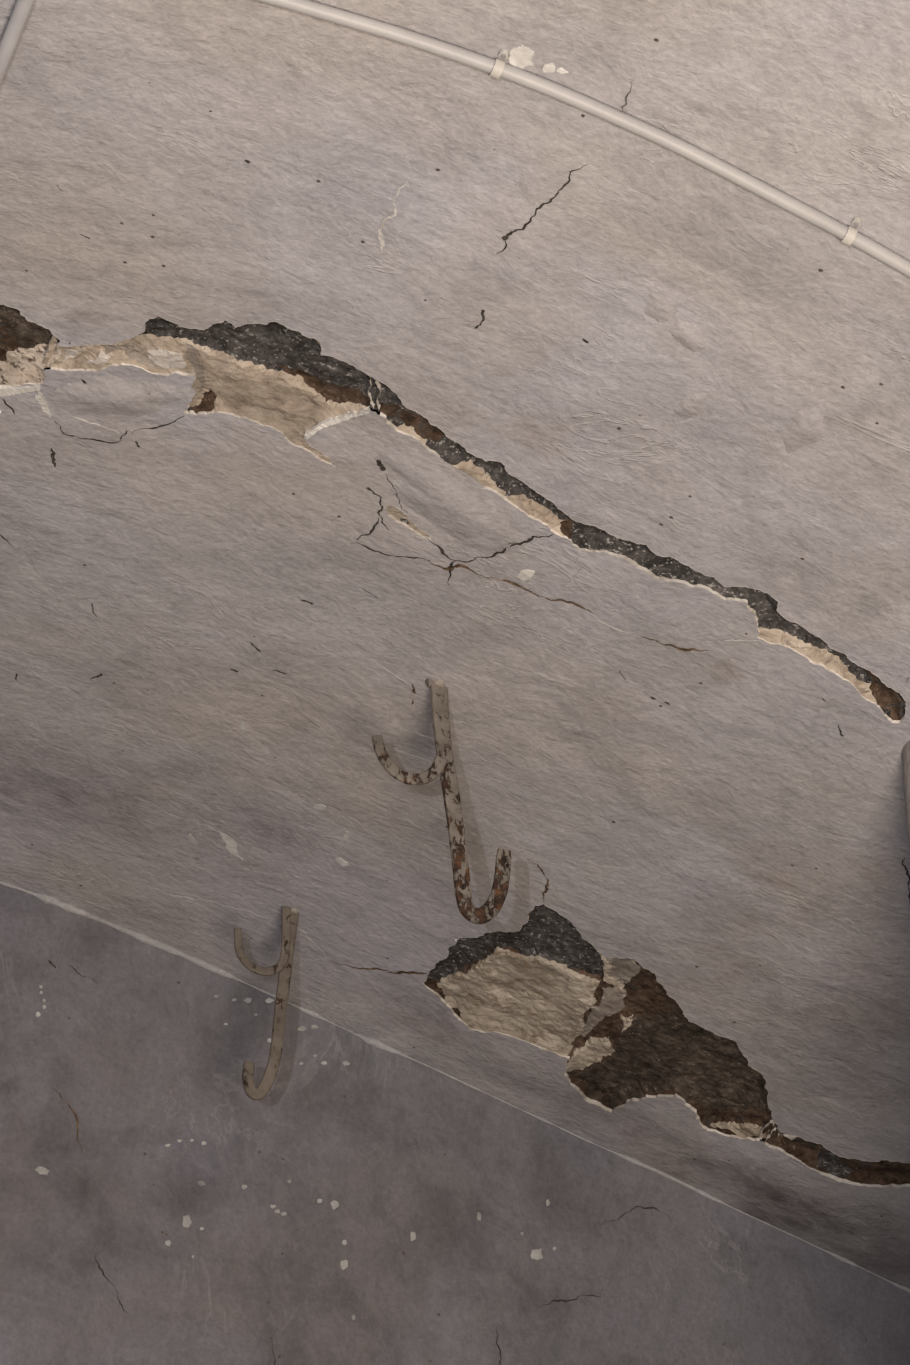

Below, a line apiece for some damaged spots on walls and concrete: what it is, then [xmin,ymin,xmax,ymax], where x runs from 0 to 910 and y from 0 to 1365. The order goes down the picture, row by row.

crack [497,164,588,254]
flaking render [0,304,381,467]
flaking render [385,505,432,540]
peeling [518,570,535,581]
crack [351,377,910,740]
peeling [219,831,243,860]
flaking render [422,904,777,1141]
peeling [531,1247,556,1260]